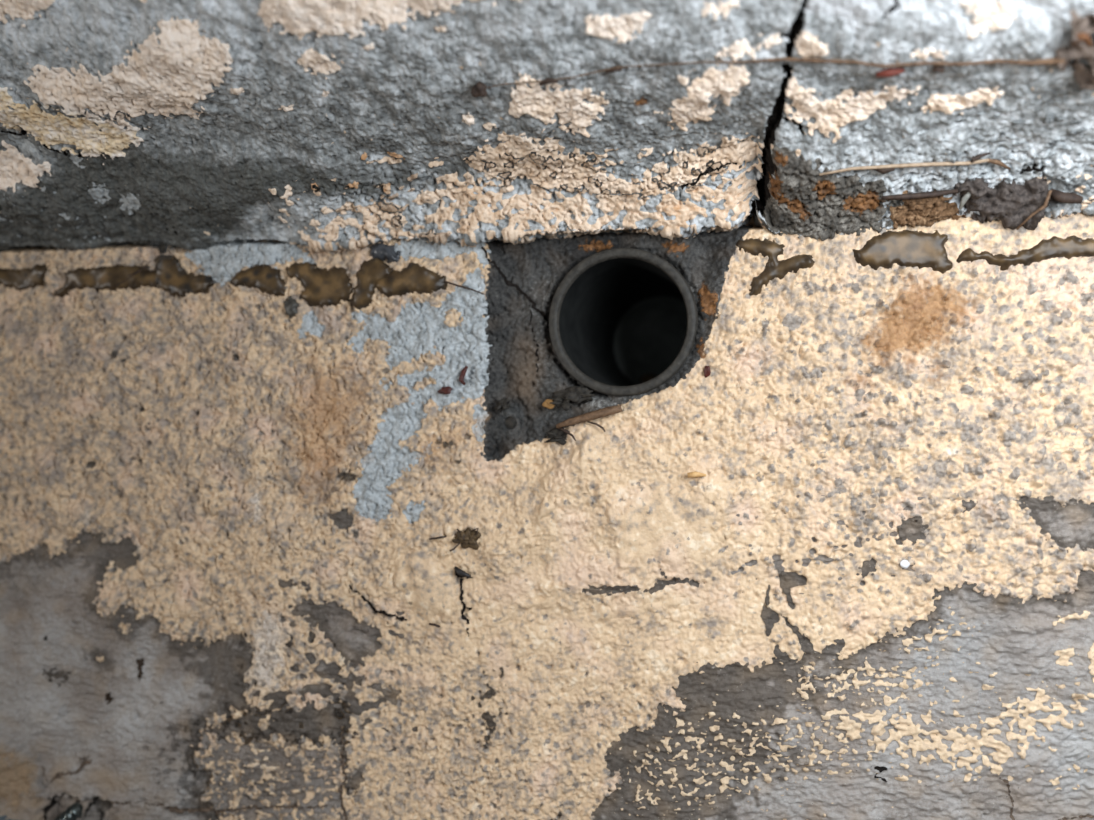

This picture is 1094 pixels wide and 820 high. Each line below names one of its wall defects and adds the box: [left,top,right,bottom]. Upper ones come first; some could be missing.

crack [681,0,808,224]
peeling [850,102,1094,192]
crack [1020,163,1047,174]
peeling [49,182,141,245]
rust [865,281,968,352]
spalling [329,224,753,532]
peeling [772,497,929,586]
peeling [1014,495,1094,553]
crack [349,585,407,621]
crack [454,566,473,636]
peeling [0,528,415,820]
peeling [582,560,1094,820]